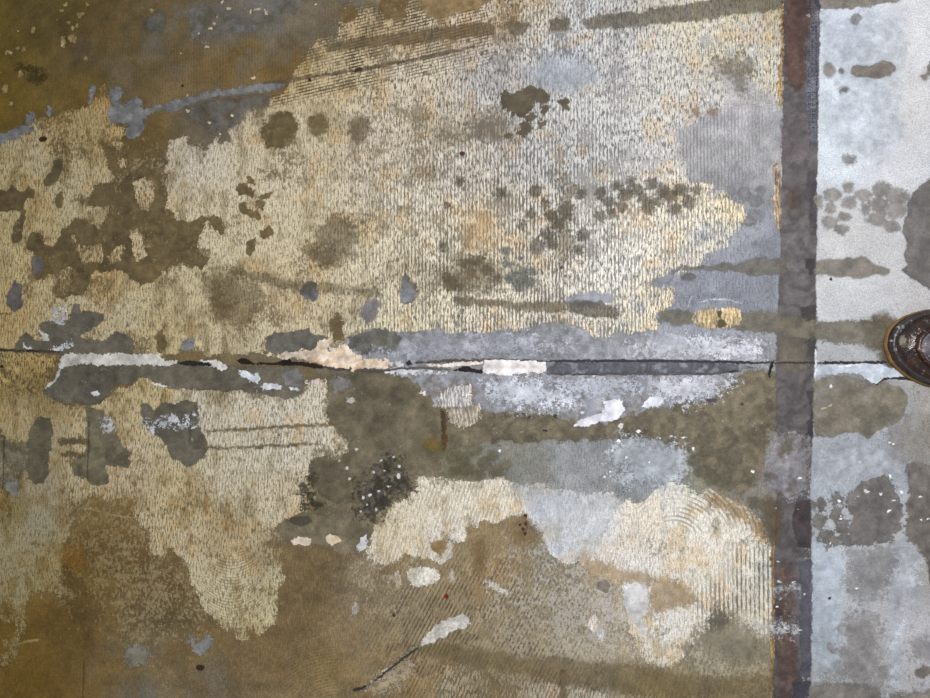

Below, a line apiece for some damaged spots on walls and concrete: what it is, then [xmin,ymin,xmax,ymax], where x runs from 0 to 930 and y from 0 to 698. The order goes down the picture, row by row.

leakage [819,0,899,24]
leakage [504,98,570,139]
leakage [814,180,930,289]
peeling [299,281,319,302]
peeling [399,272,417,304]
spalling [0,158,313,498]
crack [0,346,60,354]
crack [177,359,211,367]
crack [237,358,912,385]
peeling [265,295,777,556]
leakage [338,446,419,526]
leakage [808,461,930,698]